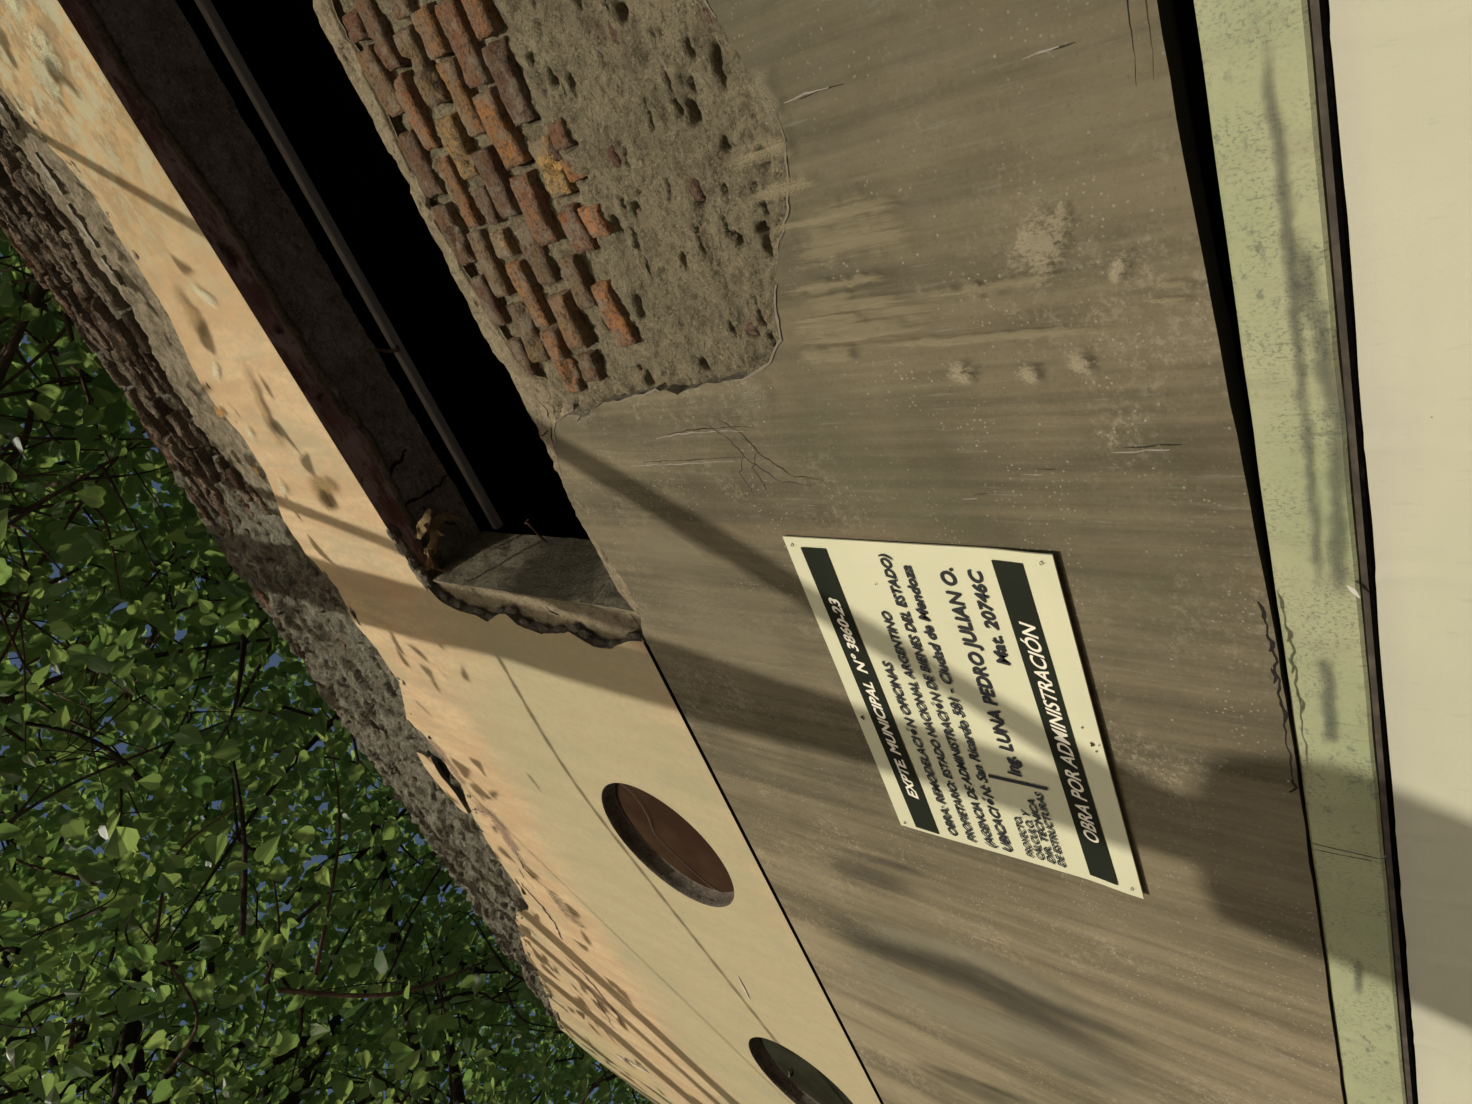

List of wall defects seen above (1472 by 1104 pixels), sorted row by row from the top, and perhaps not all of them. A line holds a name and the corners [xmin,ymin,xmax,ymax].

spalling [0,88,563,1031]
spalling [79,0,648,647]
spalling [339,0,789,474]
crack [1127,0,1136,81]